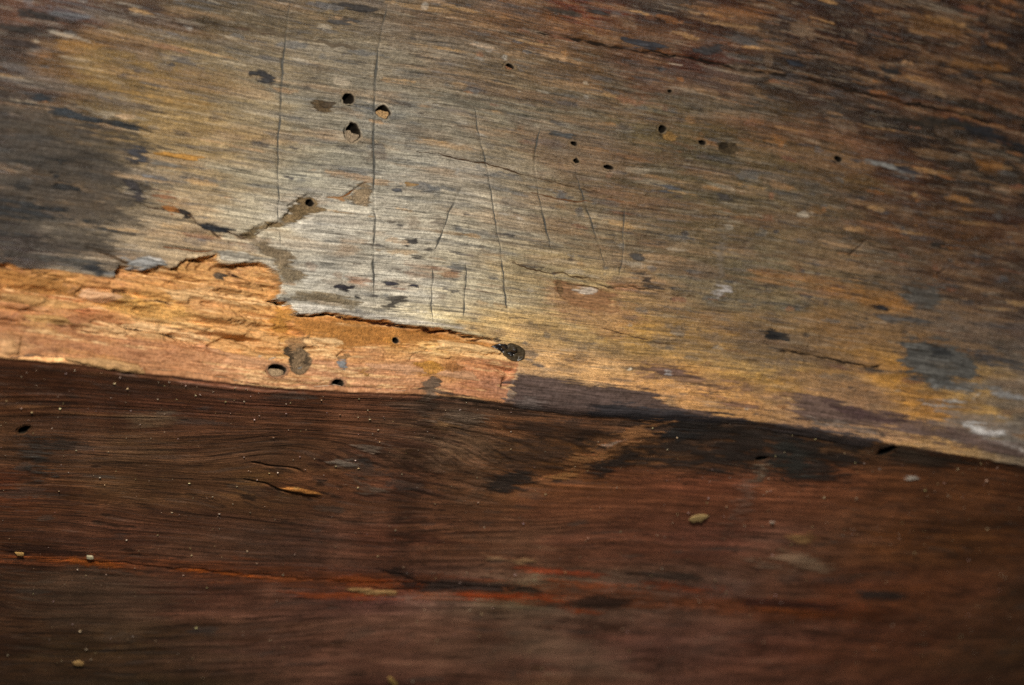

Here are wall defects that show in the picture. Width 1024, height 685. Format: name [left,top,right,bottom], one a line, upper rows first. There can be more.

peeling [122,256,167,271]
peeling [218,250,266,264]